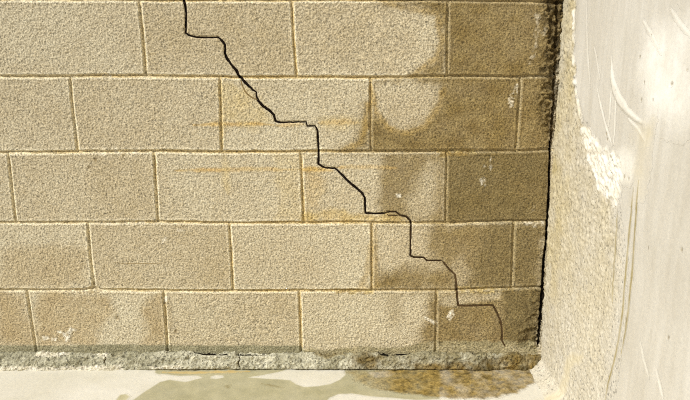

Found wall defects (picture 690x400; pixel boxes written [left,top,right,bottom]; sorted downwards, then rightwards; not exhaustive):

crack [183,0,505,346]
water stain [326,0,563,349]
crack [536,0,559,345]
water stain [115,369,441,400]